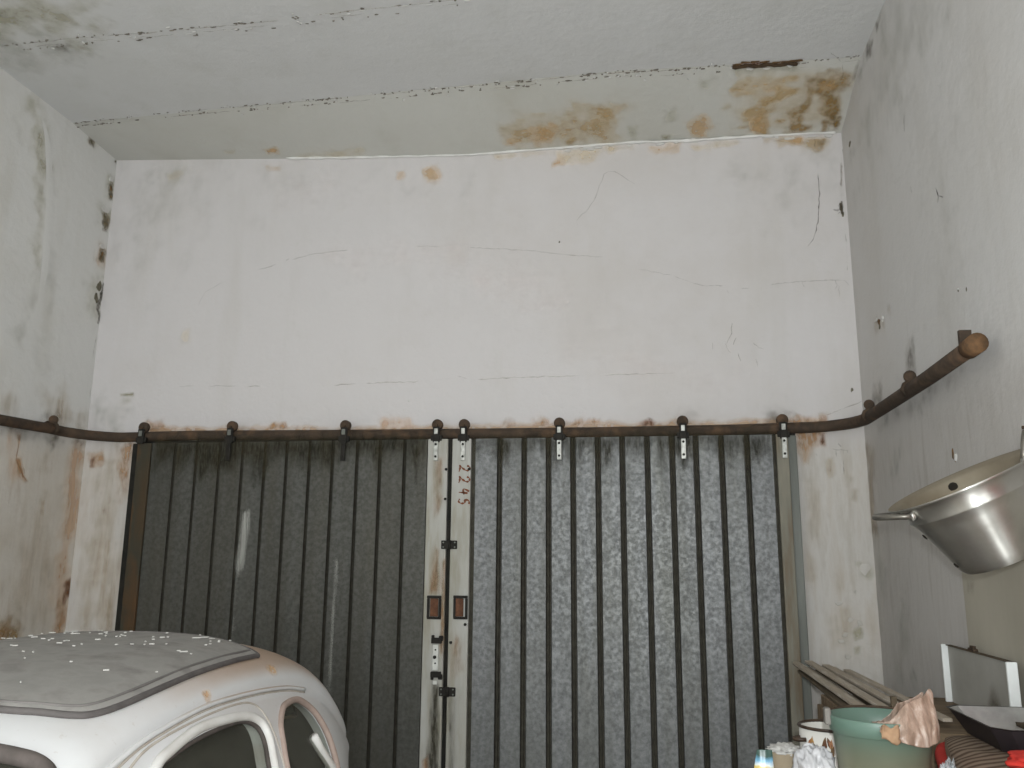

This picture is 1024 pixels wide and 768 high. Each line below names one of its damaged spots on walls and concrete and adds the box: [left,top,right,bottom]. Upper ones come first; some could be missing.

spalling [730,59,803,71]
leakage [780,75,847,150]
crack [811,178,844,242]